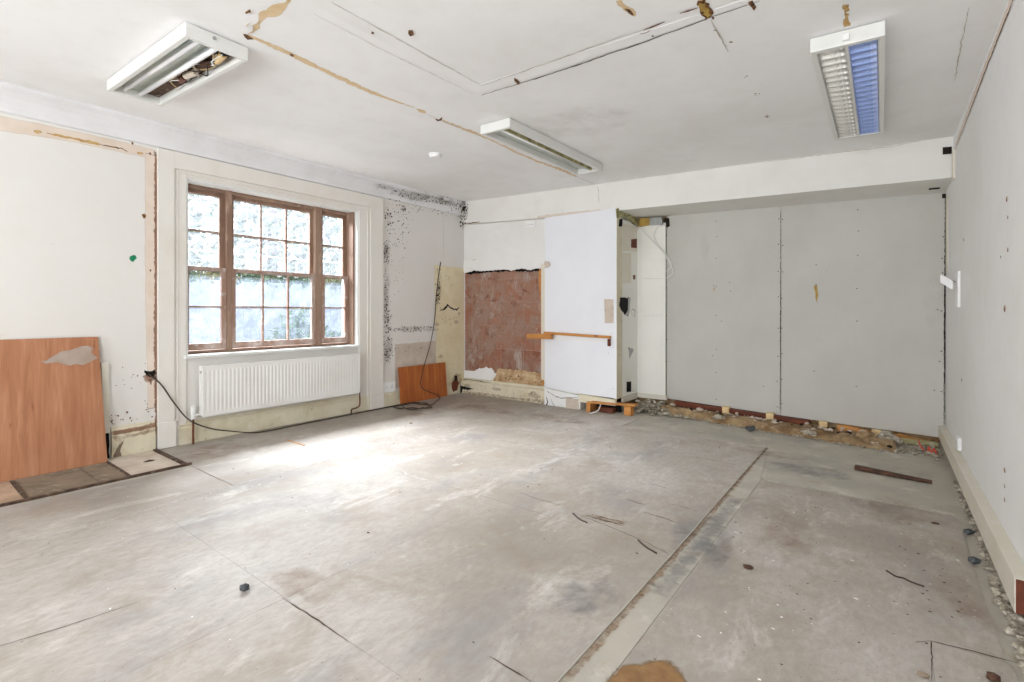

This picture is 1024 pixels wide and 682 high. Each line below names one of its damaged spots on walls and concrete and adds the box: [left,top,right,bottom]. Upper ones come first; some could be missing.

flaking render [616,0,636,16]
flaking render [697,0,715,20]
peeling [842,4,851,27]
peeling [243,0,595,185]
flaking render [34,130,143,154]
water stain [377,184,468,364]
flaking render [395,264,542,388]